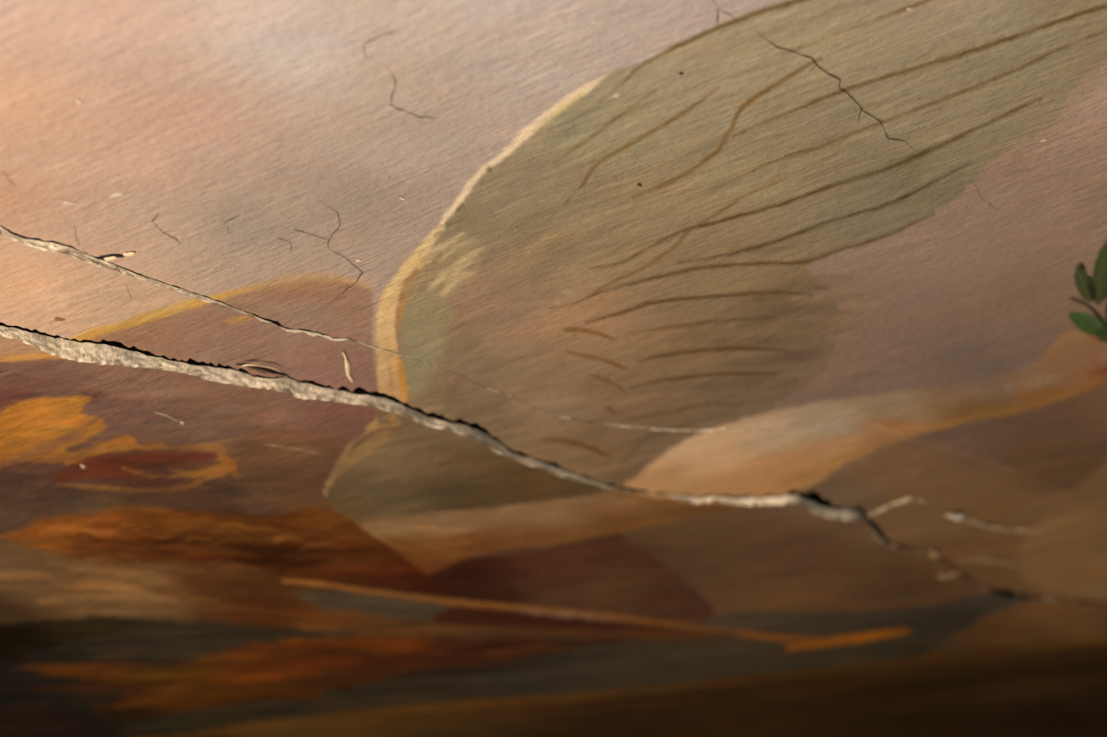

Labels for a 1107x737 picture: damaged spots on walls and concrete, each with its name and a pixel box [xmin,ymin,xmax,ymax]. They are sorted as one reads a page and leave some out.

crack [772,44,901,141]
crack [0,225,1107,604]